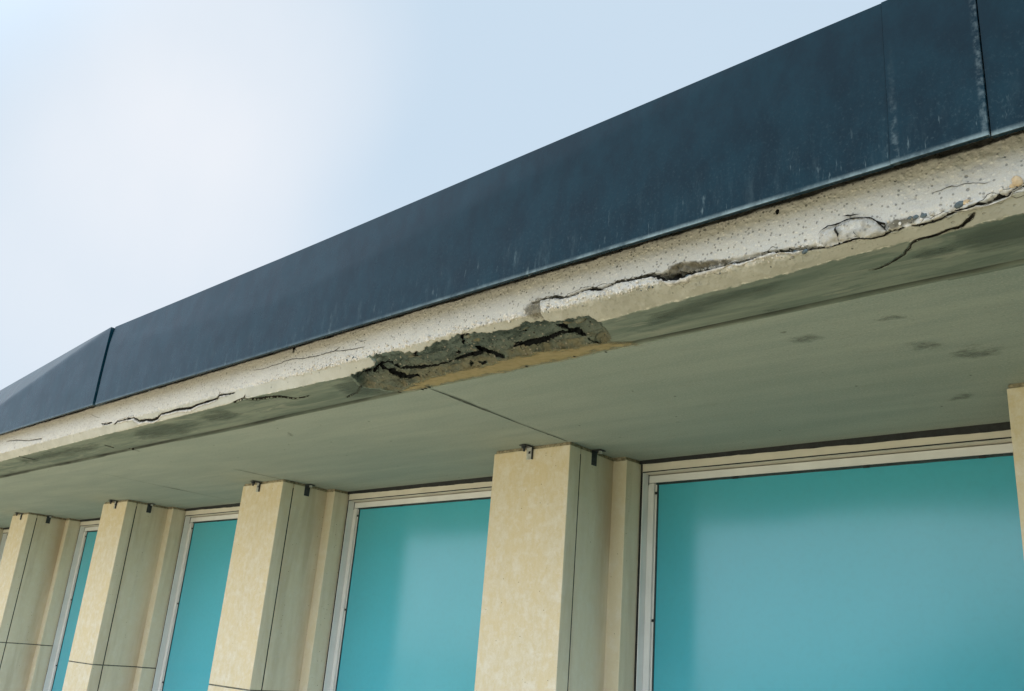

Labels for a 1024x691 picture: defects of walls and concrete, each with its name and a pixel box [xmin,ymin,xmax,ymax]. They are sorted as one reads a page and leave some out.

crack [532,175,1024,304]
spalling [256,280,655,392]
crack [95,392,309,451]